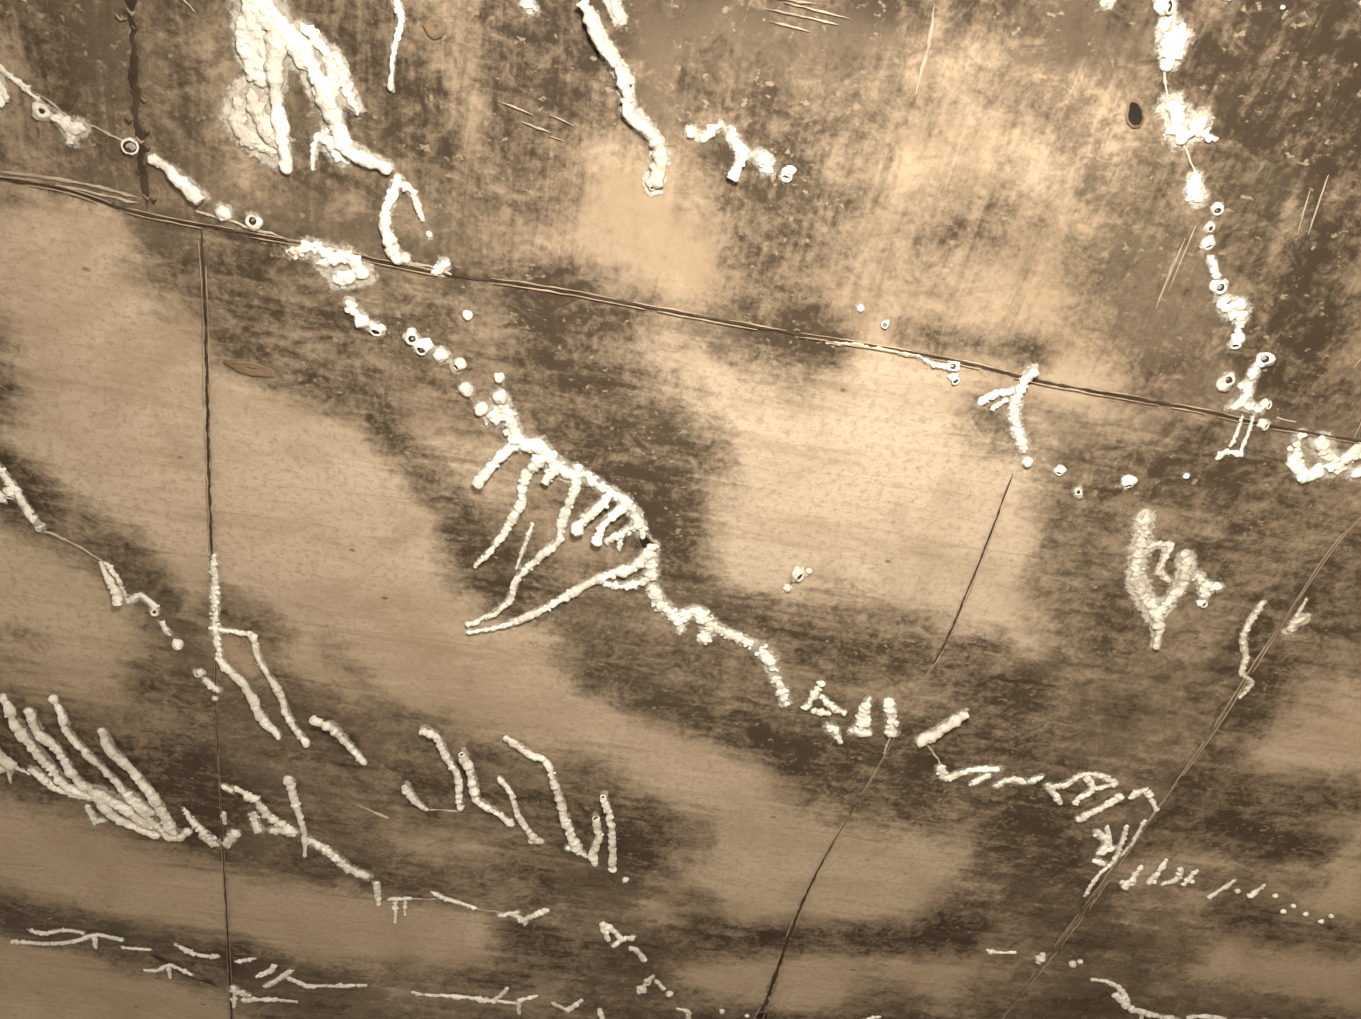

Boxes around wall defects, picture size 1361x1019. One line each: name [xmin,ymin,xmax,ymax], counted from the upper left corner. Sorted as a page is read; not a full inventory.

water stain [963,65,1076,137]
water stain [1074,159,1106,204]
water stain [877,163,1054,297]
water stain [0,337,21,424]
water stain [892,313,1059,468]
water stain [782,566,813,593]
crack [975,673,1056,687]
water stain [1146,858,1361,960]